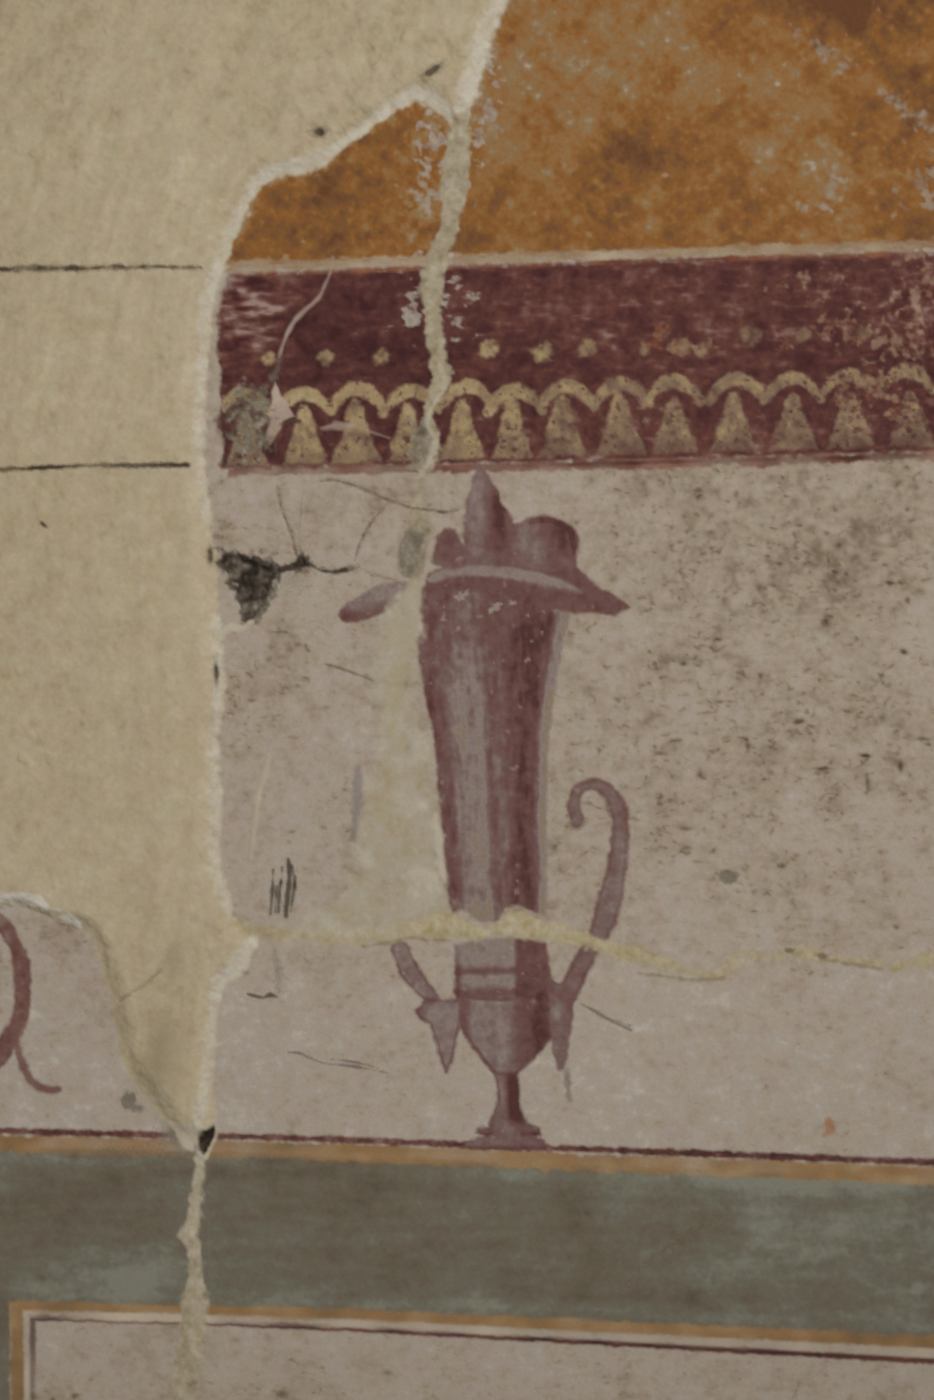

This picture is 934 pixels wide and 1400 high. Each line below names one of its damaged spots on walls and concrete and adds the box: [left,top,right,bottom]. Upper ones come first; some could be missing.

spalling [416,57,449,84]
spalling [304,122,332,143]
crack [257,254,336,403]
crack [274,48,513,584]
peeling [213,374,358,469]
spalling [203,541,317,696]
peeling [19,891,84,930]
crack [226,906,934,985]
crack [167,1158,213,1400]